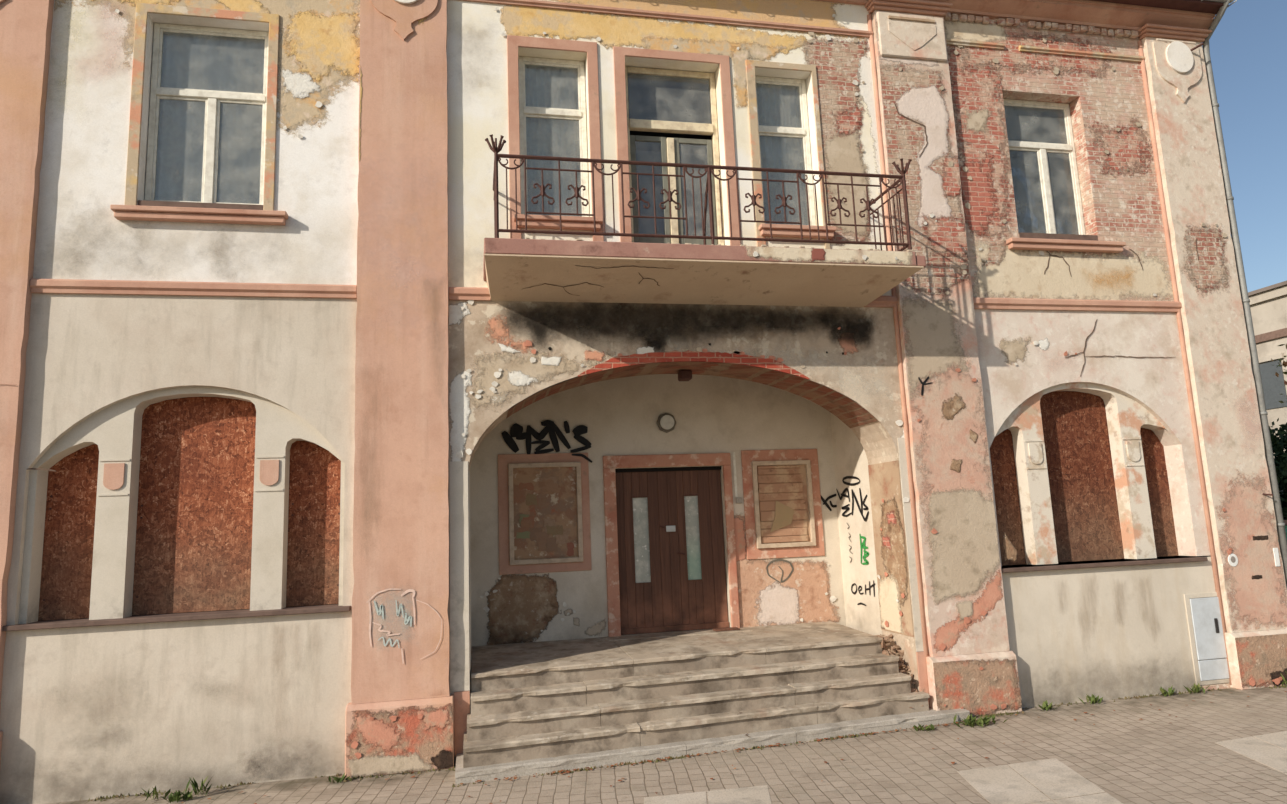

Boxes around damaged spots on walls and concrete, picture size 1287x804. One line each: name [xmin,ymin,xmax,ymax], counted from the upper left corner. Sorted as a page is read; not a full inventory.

peeling [54,0,360,139]
flaking render [1089,118,1153,178]
leakage [533,324,545,343]
crack [524,265,671,296]
leakage [647,338,665,350]
flaking render [449,0,1115,629]
leakage [831,324,871,342]
crack [1065,320,1172,377]
flaking render [480,573,564,645]
flaking render [933,533,1022,715]
peeling [1217,471,1287,688]
flaking render [345,703,453,778]